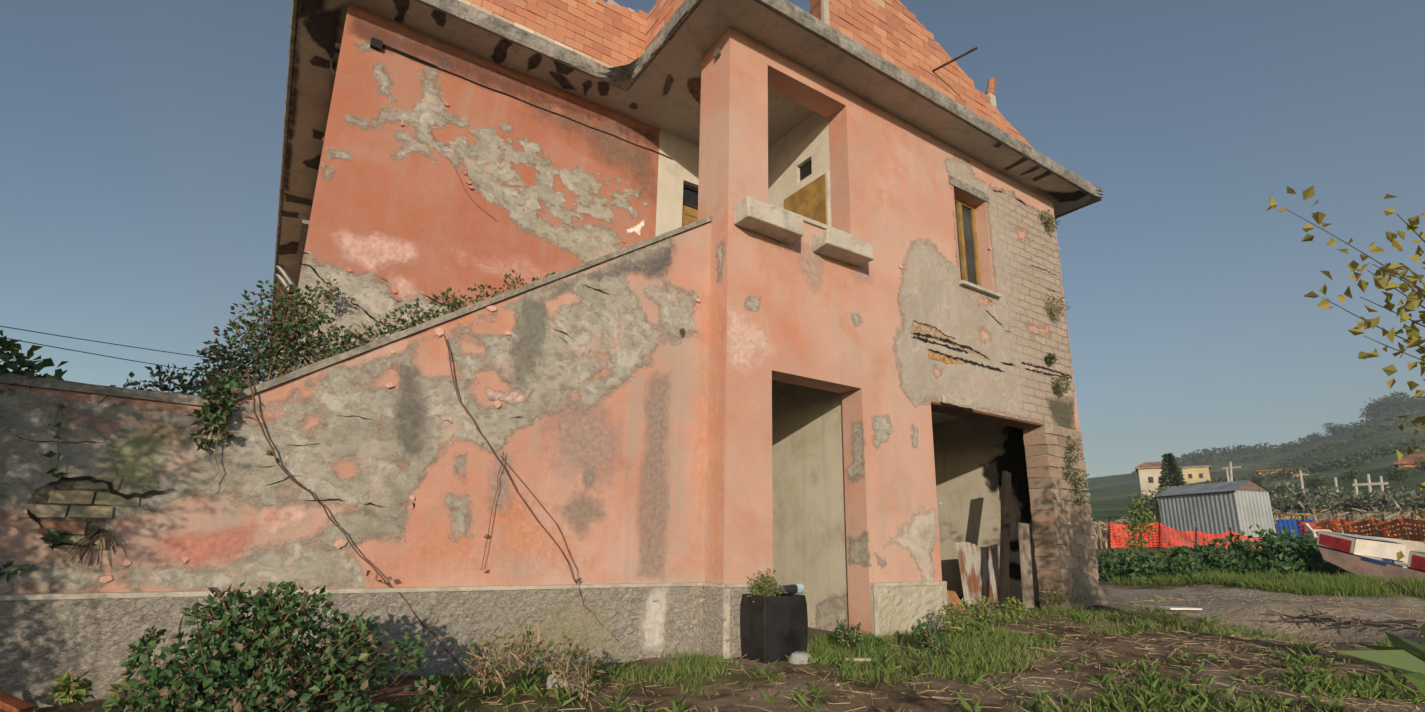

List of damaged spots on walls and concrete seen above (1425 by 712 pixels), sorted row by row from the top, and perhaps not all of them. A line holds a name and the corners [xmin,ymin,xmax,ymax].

peeling [0,39,701,594]
peeling [716,241,726,283]
flaking render [894,153,1079,468]
crack [3,435,173,548]
peeling [845,414,893,483]
peeling [847,506,937,581]